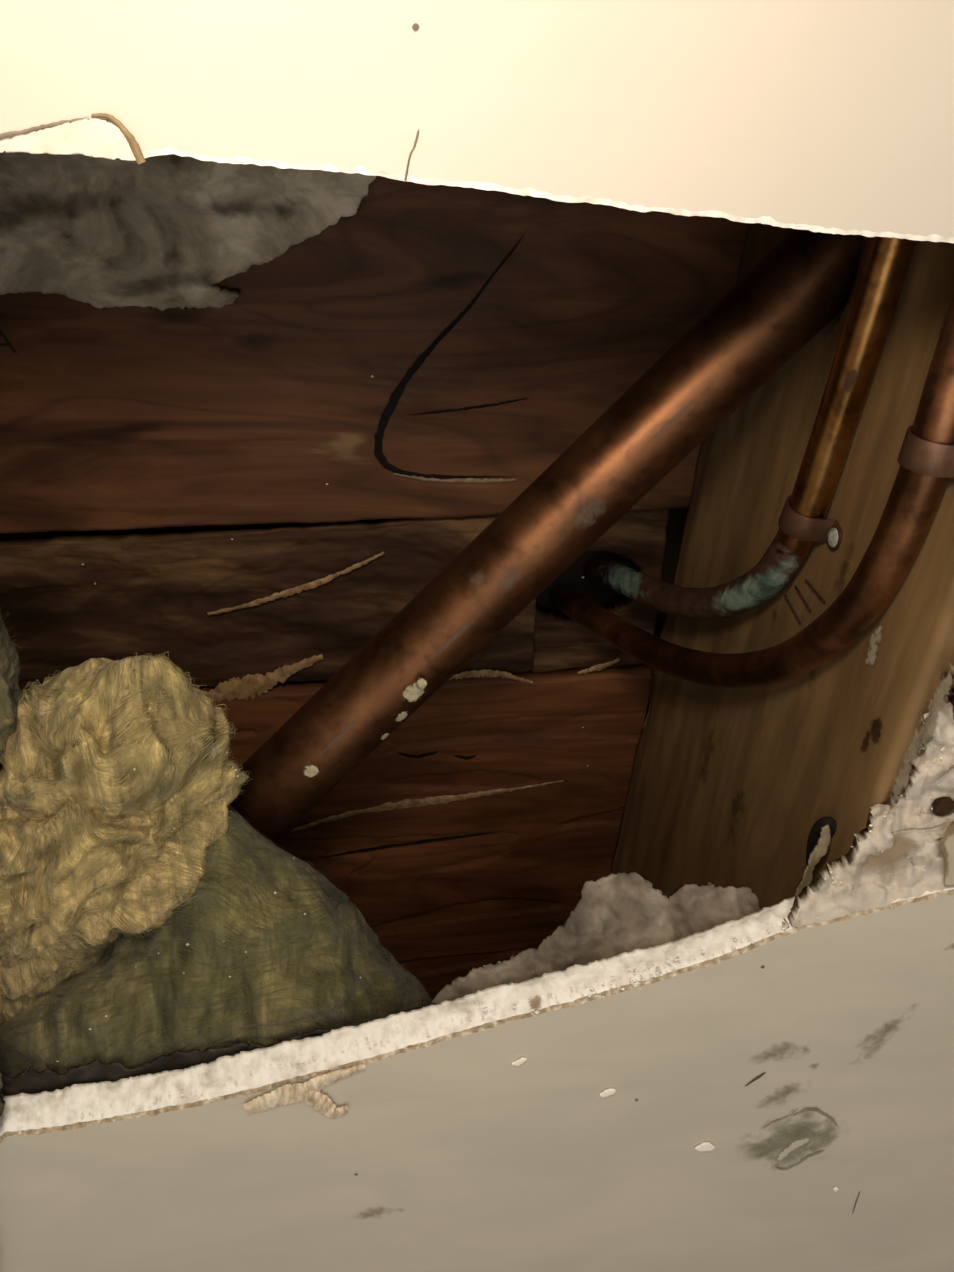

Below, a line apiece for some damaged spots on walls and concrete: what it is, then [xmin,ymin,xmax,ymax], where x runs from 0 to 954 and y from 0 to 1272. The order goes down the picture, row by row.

peeling [0,113,146,165]
crack [374,235,527,483]
spalling [782,695,954,931]
peeling [599,1088,616,1098]
leakage [753,1108,837,1170]